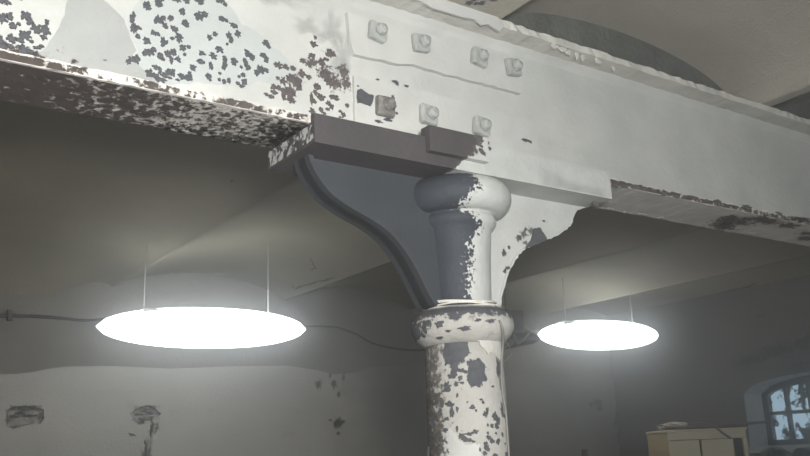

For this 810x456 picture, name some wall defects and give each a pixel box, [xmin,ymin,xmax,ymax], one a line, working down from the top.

peeling [0,0,295,89]
peeling [268,125,313,167]
peeling [610,179,810,225]
spalling [502,220,547,256]
peeling [411,306,512,456]
spalling [6,405,44,429]
spalling [129,405,161,432]